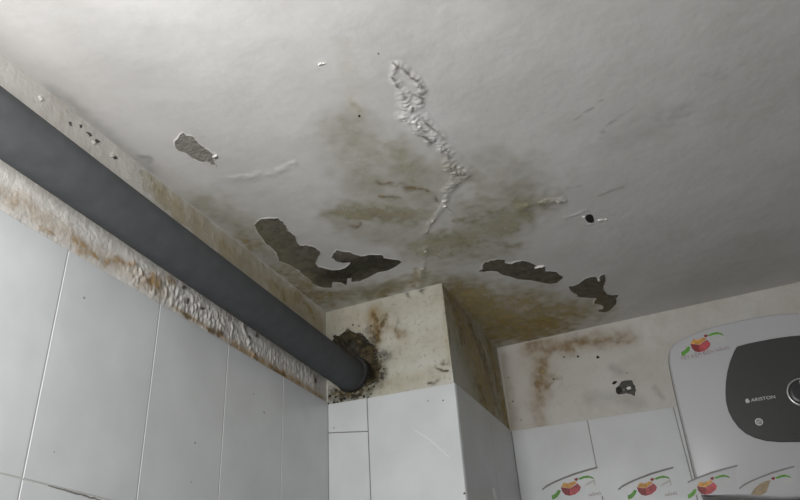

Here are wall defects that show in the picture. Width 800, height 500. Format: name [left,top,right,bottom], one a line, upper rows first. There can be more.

peeling [173,132,217,167]
leakage [333,195,421,228]
peeling [253,217,402,289]
peeling [477,259,619,313]
spalling [332,329,381,387]
leakage [328,324,387,404]
leakage [433,279,586,428]
spalling [612,380,636,396]